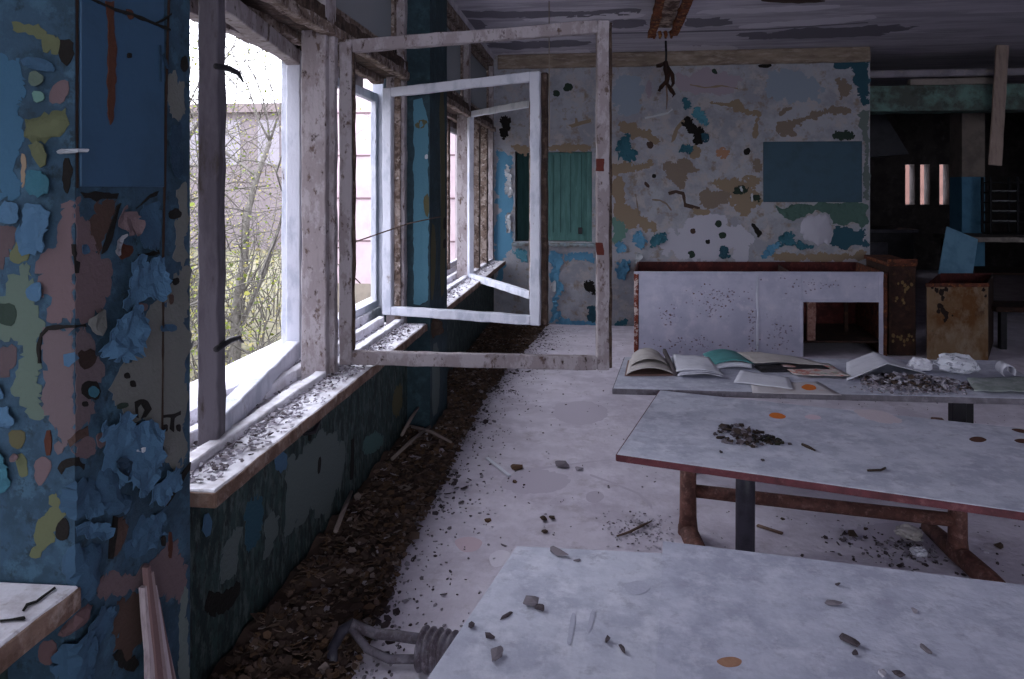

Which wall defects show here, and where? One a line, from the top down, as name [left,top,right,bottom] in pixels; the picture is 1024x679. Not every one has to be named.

peeling [0,21,194,679]
peeling [494,149,528,281]
peeling [548,250,596,325]
peeling [612,61,871,280]